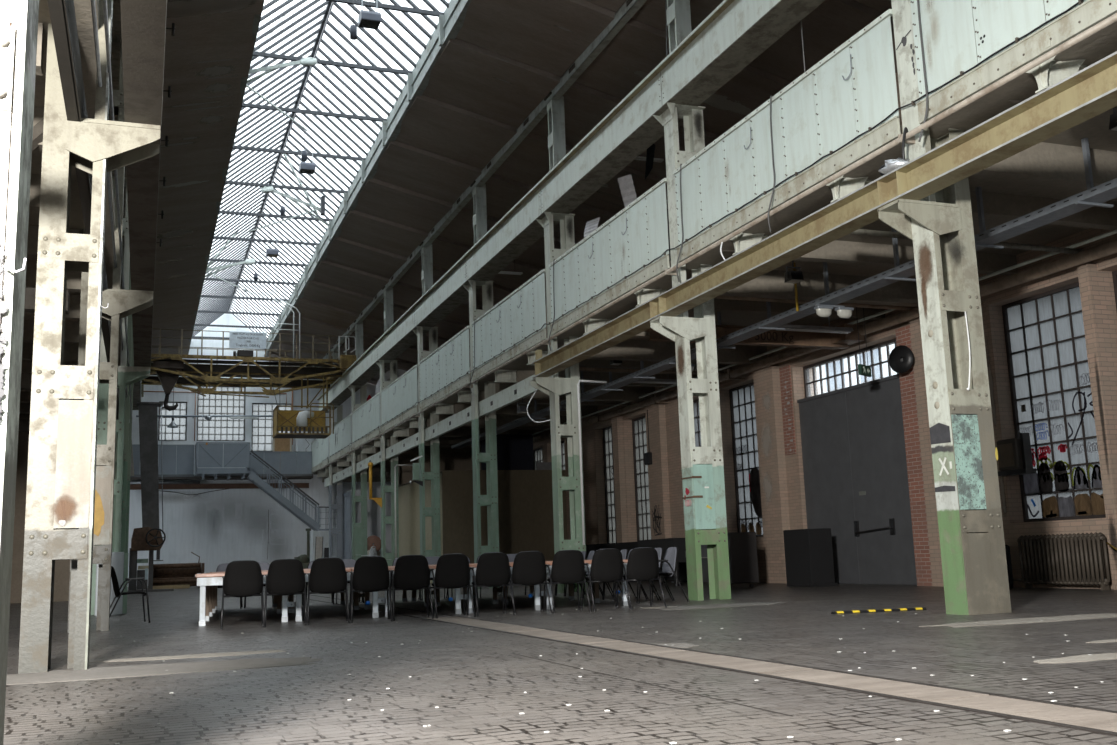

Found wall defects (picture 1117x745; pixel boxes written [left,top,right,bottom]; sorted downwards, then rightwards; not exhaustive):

peeling [0,241,9,424]
rust [54,497,75,521]